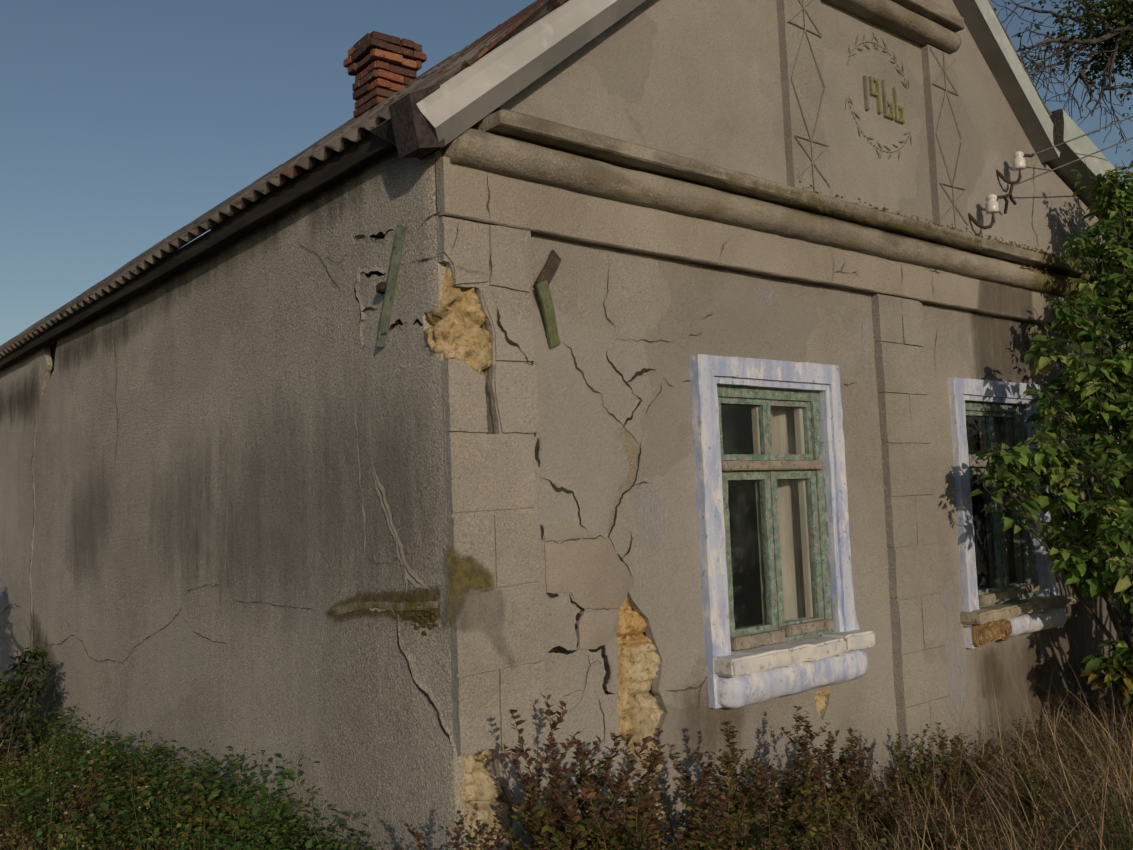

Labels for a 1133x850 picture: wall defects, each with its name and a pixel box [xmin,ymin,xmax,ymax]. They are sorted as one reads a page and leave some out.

crack [0,396,314,666]
crack [299,175,534,757]
flaking render [424,267,492,385]
crack [535,249,714,587]
flaking render [458,750,511,850]
crack [546,592,617,742]
flaking render [612,597,671,837]
crack [665,677,708,712]